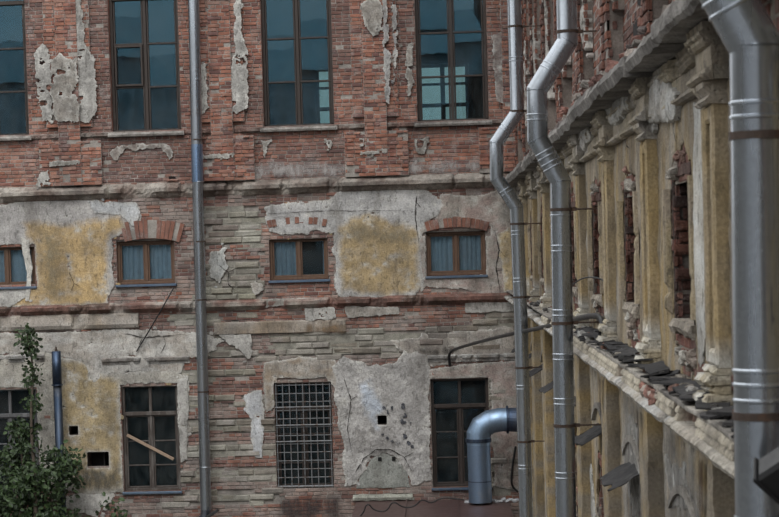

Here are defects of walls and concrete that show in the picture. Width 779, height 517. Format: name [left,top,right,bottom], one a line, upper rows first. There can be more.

peeling [34,0,98,124]
peeling [231,0,249,114]
peeling [523,0,549,127]
peeling [580,0,594,59]
peeling [209,243,229,288]